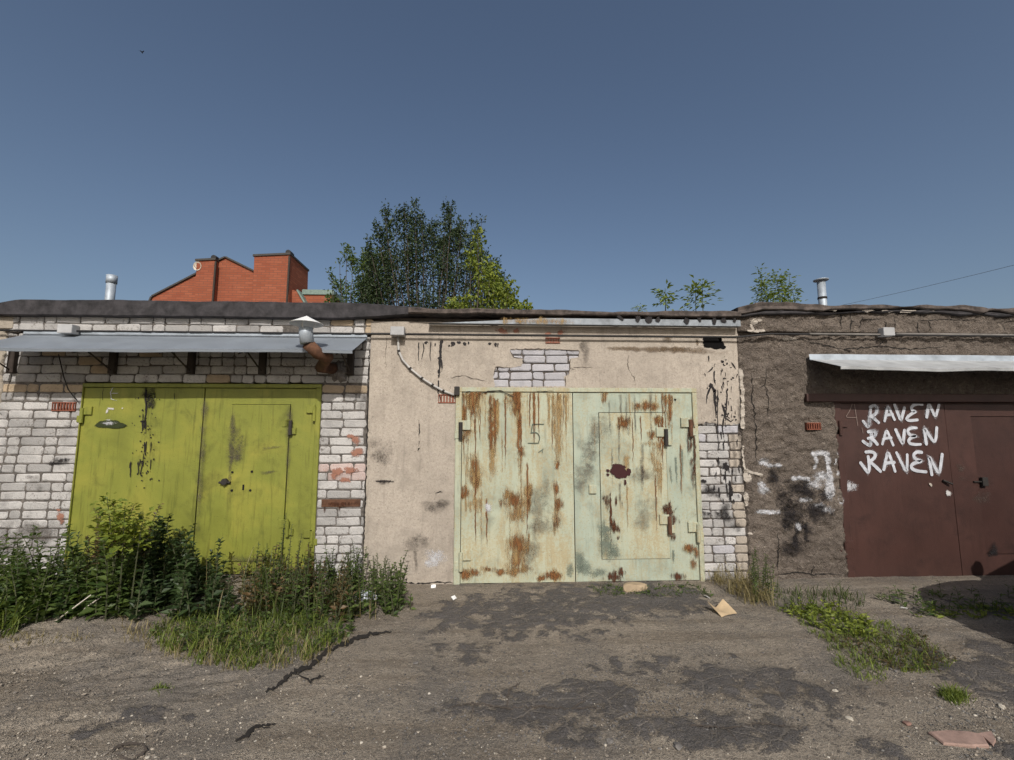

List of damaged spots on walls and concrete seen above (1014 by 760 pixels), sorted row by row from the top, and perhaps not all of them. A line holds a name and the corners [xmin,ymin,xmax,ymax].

spalling [703,338,726,350]
crack [797,314,1012,353]
peeling [493,348,580,387]
rust [461,392,569,579]
rust [602,393,696,540]
rust [538,570,561,582]
rust [603,568,623,582]
rust [671,544,698,581]